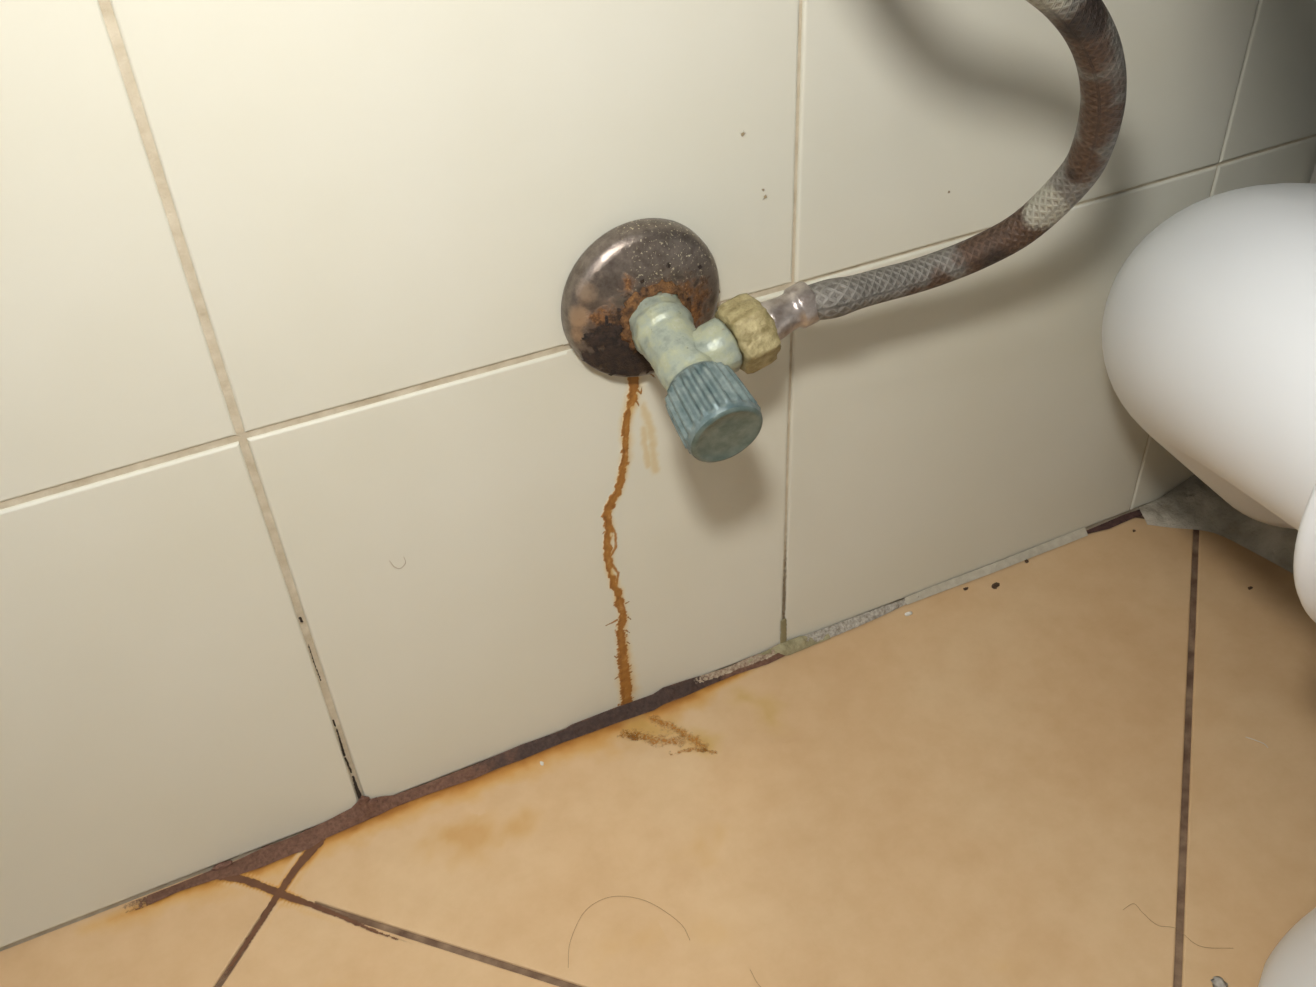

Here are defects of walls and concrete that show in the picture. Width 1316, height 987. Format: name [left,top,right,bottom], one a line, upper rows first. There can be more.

corrosion [619,279,691,350]
corrosion [685,223,723,296]
corrosion [562,331,799,720]
corrosion [63,726,647,976]